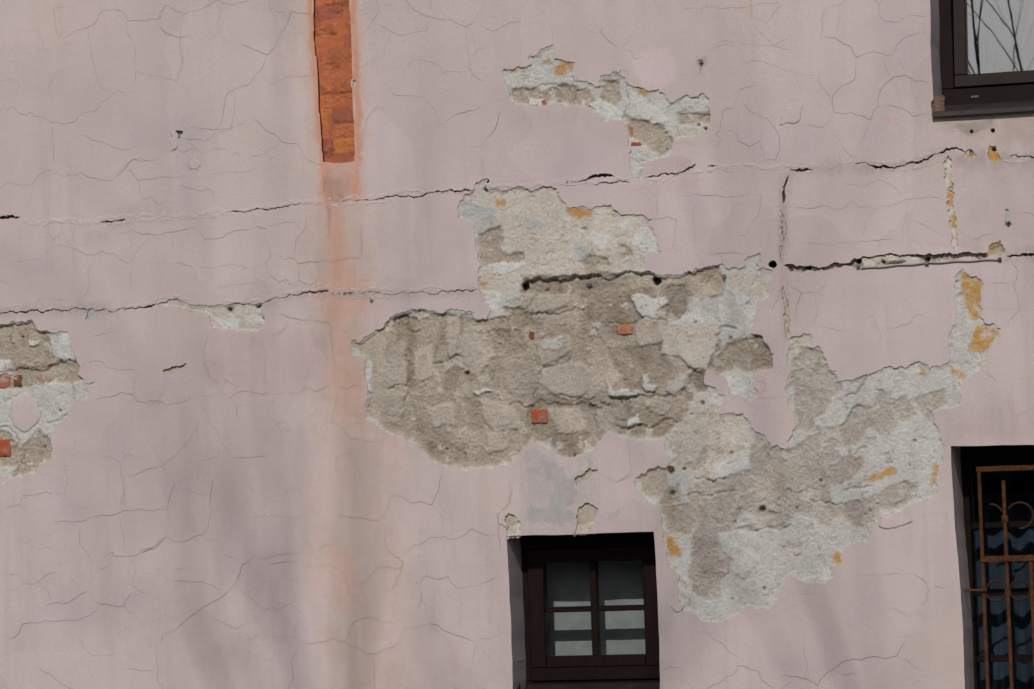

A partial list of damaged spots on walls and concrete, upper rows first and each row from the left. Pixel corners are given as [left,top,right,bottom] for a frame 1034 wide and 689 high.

flaking render [503,45,711,181]
crack [1004,155,1034,164]
flaking render [155,299,266,332]
crack [0,1,986,457]
crack [992,250,1034,312]
flaking render [0,320,94,487]
flaking render [351,178,1008,623]